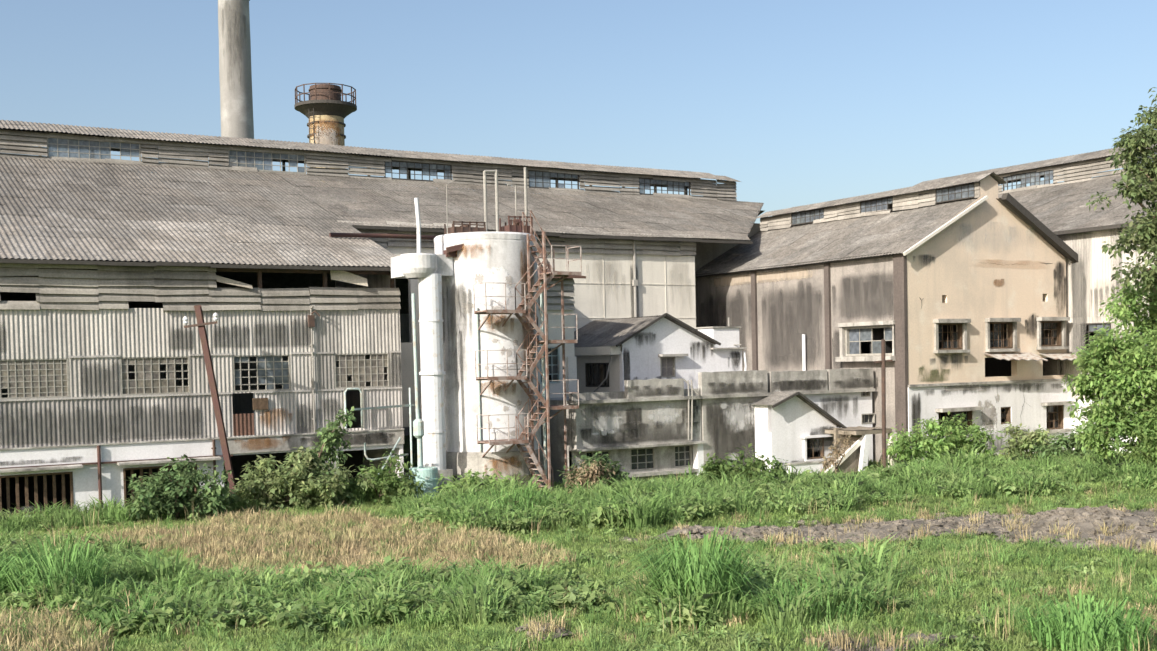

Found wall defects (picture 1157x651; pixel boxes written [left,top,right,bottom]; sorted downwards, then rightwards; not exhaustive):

damp [170,329,193,349]
damp [213,321,311,347]
damp [442,287,471,337]
rust [487,254,535,366]
damp [630,268,639,317]
damp [707,269,893,365]
damp [1054,262,1131,354]
damp [920,354,967,376]
damp [0,406,201,445]
damp [581,333,878,463]
damp [781,427,833,471]
damp [912,383,1039,434]